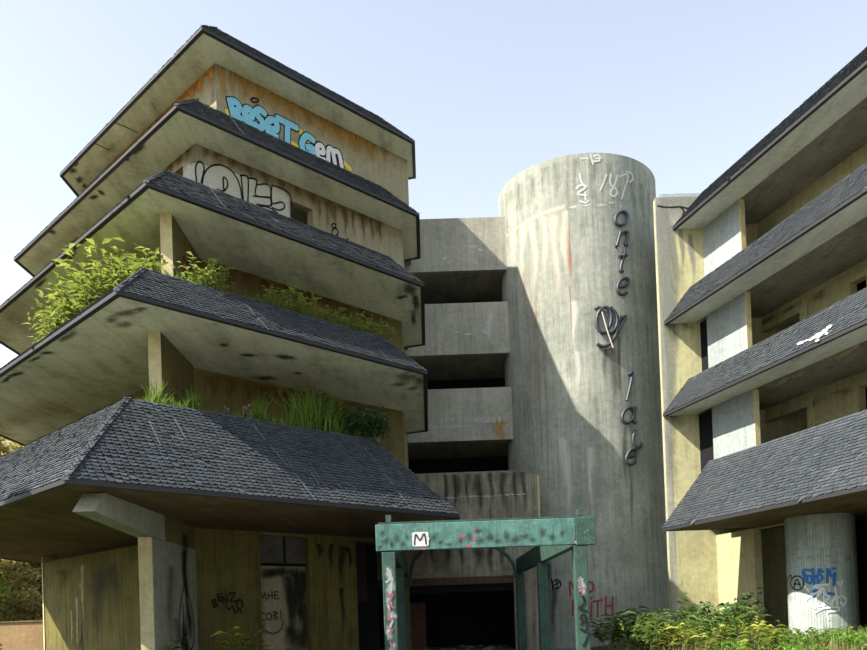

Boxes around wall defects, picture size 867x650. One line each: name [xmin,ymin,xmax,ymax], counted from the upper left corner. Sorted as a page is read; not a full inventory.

corrosion [111,65,214,165]
water stain [507,205,587,288]
water stain [444,472,526,501]
water stain [71,565,84,638]